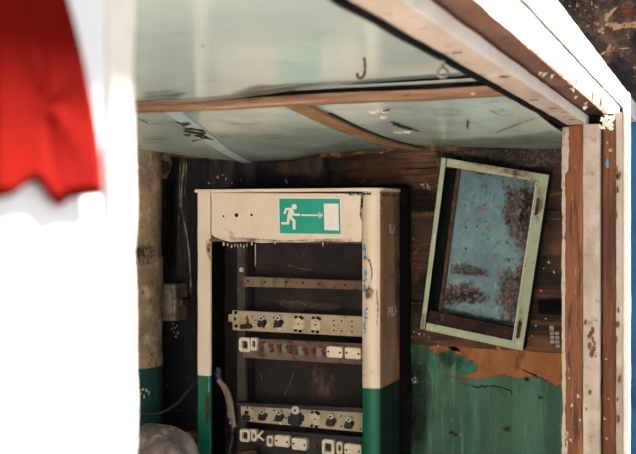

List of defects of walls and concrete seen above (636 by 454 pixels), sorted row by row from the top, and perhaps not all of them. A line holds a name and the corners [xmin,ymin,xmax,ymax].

flaking render [563,0,636,34]
peeling [520,38,608,113]
peeling [426,119,577,454]
crack [461,383,512,394]